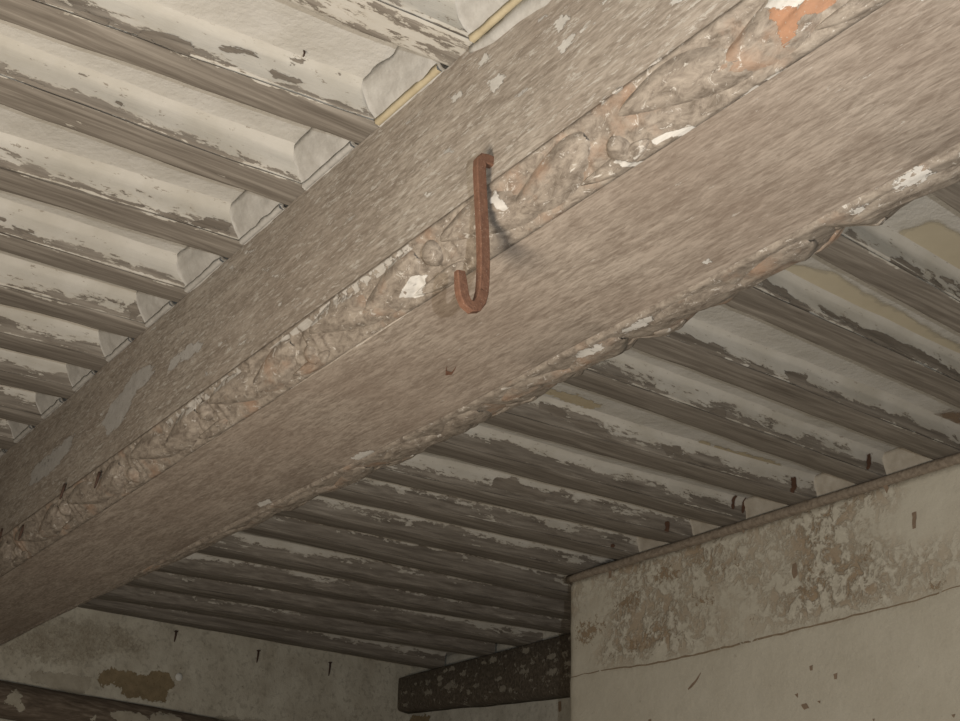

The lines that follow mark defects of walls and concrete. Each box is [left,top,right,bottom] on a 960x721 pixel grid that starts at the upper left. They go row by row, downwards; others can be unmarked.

peeling [764,0,804,10]
peeling [127,30,194,57]
peeling [218,45,261,59]
peeling [652,126,695,145]
peeling [892,165,936,190]
peeling [490,191,509,211]
peeling [154,204,283,254]
peeling [270,244,413,349]
peeling [399,275,428,298]
peeling [762,279,960,382]
crack [571,585,960,690]
spalling [98,667,175,703]